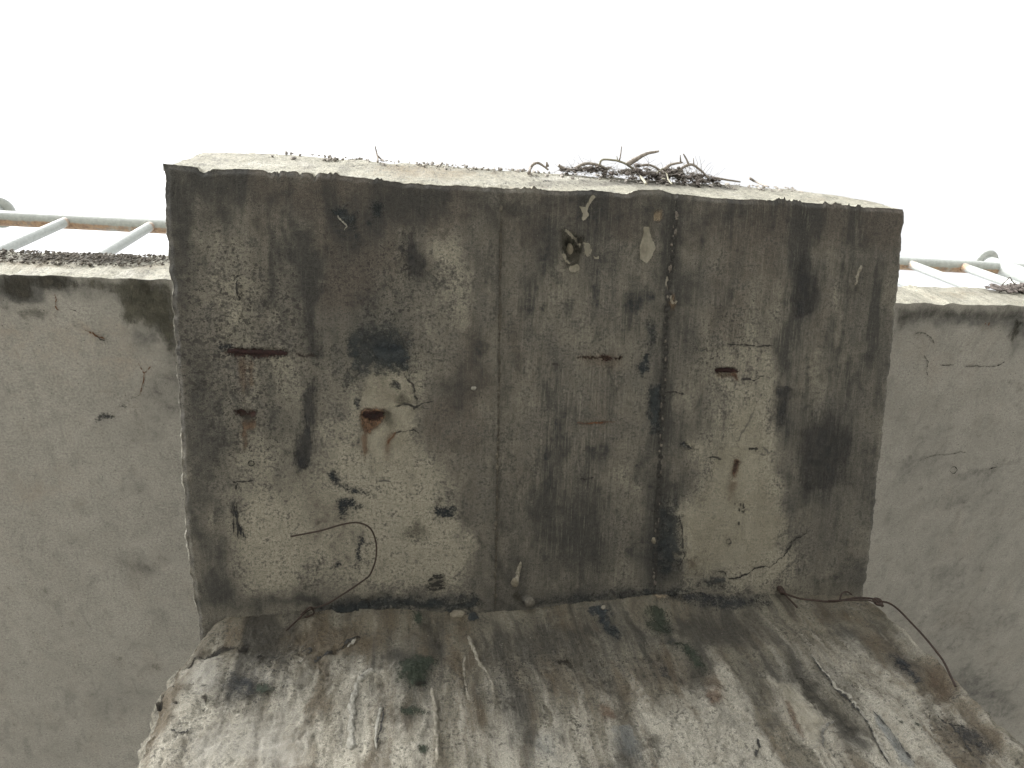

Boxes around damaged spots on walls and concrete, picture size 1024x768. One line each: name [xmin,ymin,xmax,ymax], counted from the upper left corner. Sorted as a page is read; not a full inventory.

leakage [294,378,318,472]
leakage [798,414,852,496]
spalling [188,645,263,669]